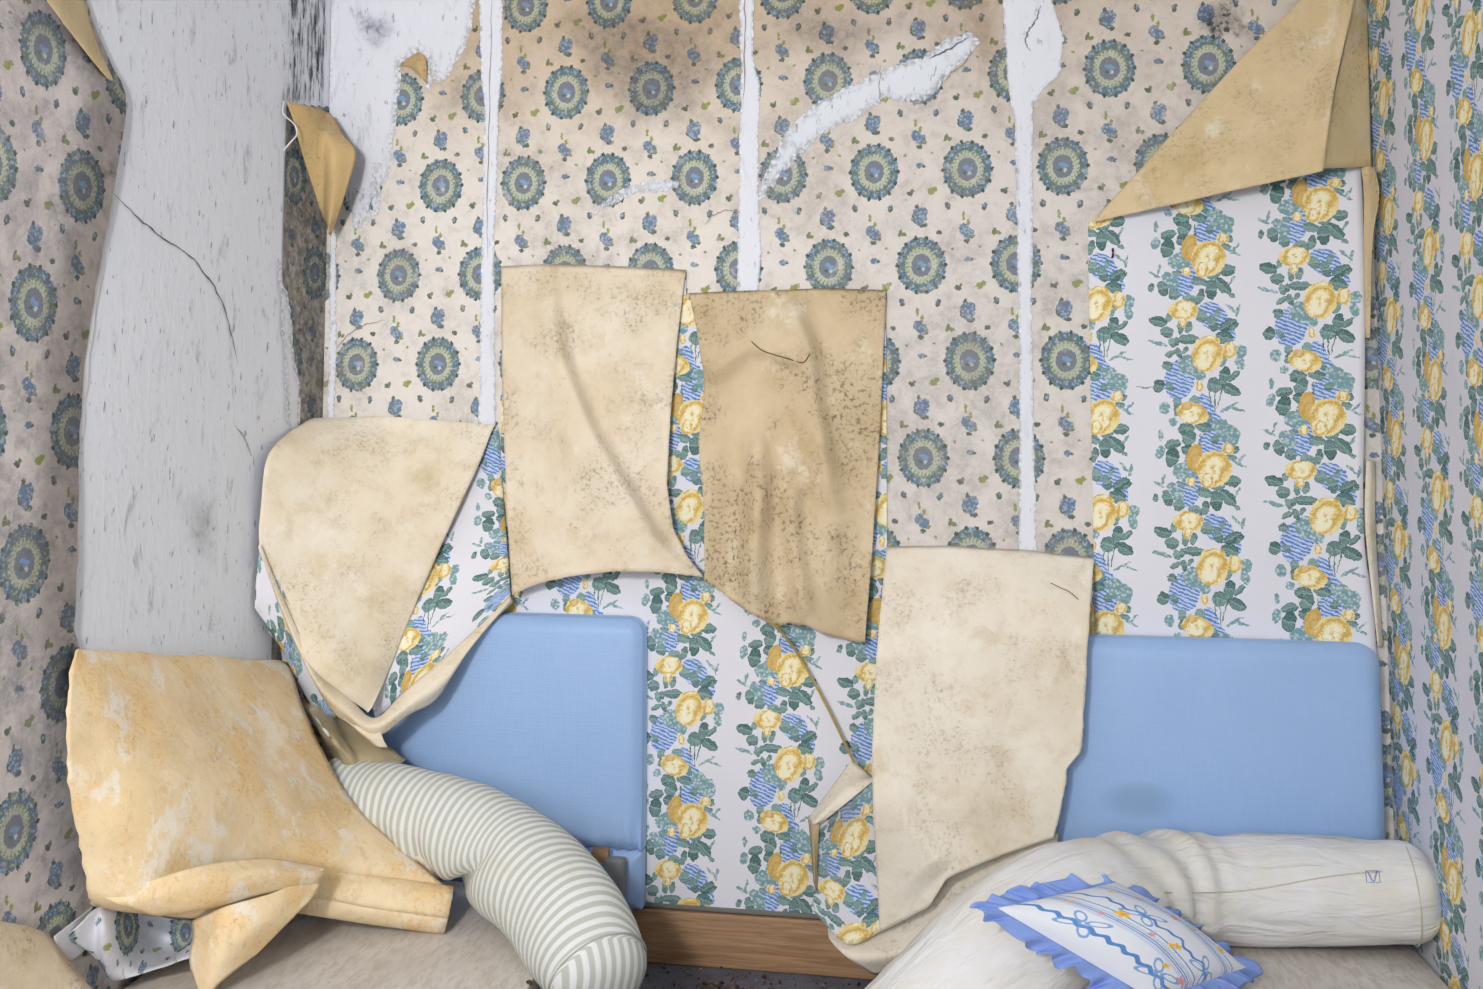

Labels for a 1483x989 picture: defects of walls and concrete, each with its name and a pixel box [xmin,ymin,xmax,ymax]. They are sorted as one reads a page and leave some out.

crack [114,194,238,362]
flaking render [287,0,503,425]
spalling [593,179,679,215]
spalling [737,0,980,291]
flaking render [1003,0,1064,551]